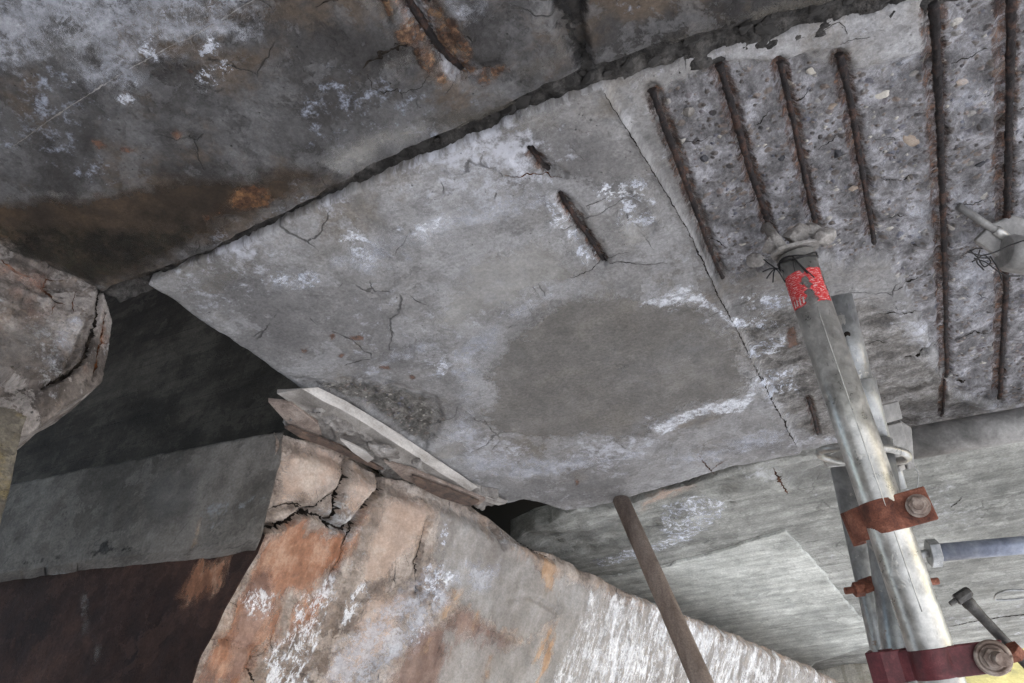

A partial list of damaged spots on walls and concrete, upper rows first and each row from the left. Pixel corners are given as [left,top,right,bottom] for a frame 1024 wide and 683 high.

water stain [0,0,235,105]
corrosion [991,0,1021,222]
crack [2,260,107,389]
water stain [0,170,315,282]
corrosion [180,557,230,606]
corrosion [198,513,367,683]
crack [264,459,379,584]
peeling [340,438,374,462]
water stain [432,286,796,479]
crack [604,93,797,447]
spalling [647,0,1024,437]
corrosion [918,3,951,412]